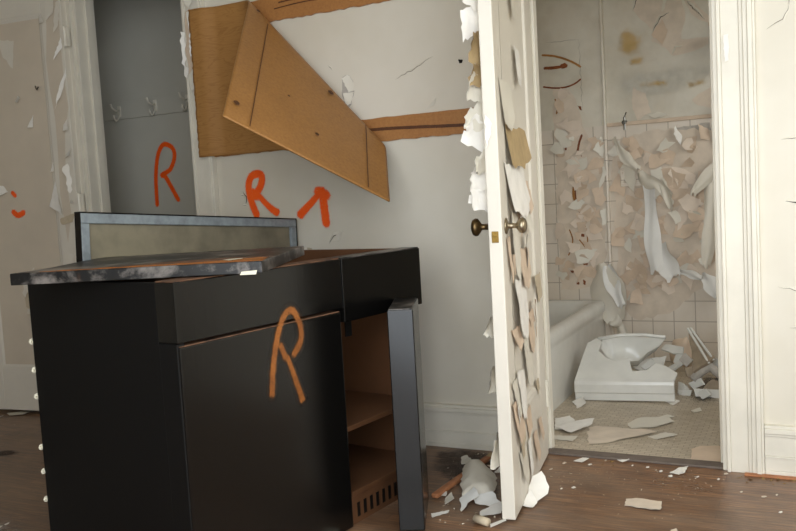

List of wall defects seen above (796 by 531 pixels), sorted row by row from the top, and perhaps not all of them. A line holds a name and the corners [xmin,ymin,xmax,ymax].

peeling [180,0,194,91]
peeling [632,0,709,56]
crack [767,0,789,29]
peeling [460,0,492,213]
peeling [550,87,716,334]
peeling [498,46,549,507]
peeling [483,315,494,338]
peeling [487,366,496,394]